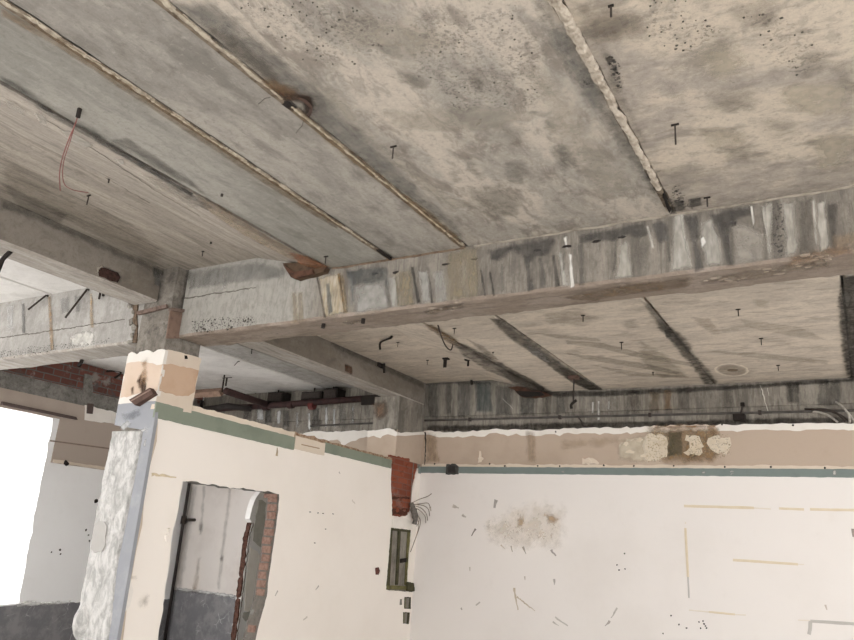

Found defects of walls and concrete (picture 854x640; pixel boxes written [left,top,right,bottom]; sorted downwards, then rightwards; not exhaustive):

water stain [3,80,209,209]
corrosion [267,81,313,117]
corrosion [200,198,345,318]
water stain [491,237,574,291]
water stain [581,186,836,277]
water stain [426,276,854,463]
spalling [388,455,417,517]
peeling [619,430,674,467]
peeling [683,423,731,456]
spalling [174,493,279,640]